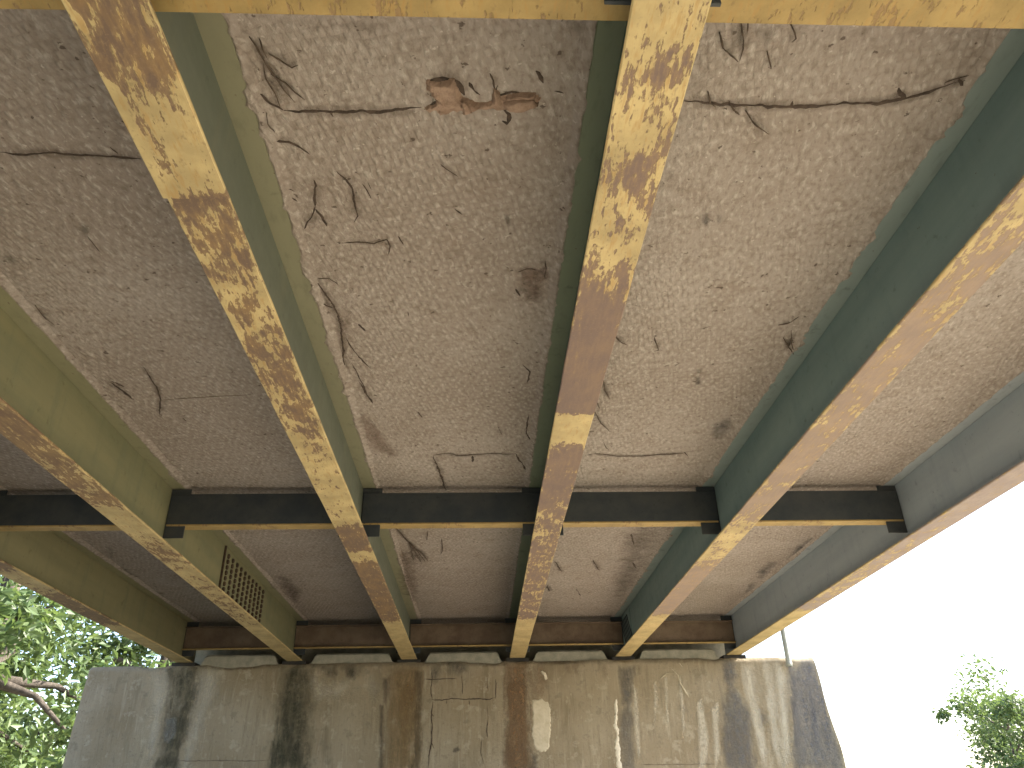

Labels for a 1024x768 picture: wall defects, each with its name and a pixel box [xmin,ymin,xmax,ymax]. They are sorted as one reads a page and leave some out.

crack [260,71,563,125]
spalling [425,78,541,116]
crack [684,75,969,109]
crack [2,147,140,159]
crack [277,140,310,155]
crack [289,172,404,254]
crack [515,262,547,296]
crack [317,278,370,398]
crack [433,416,530,489]
leakage [274,668,307,766]